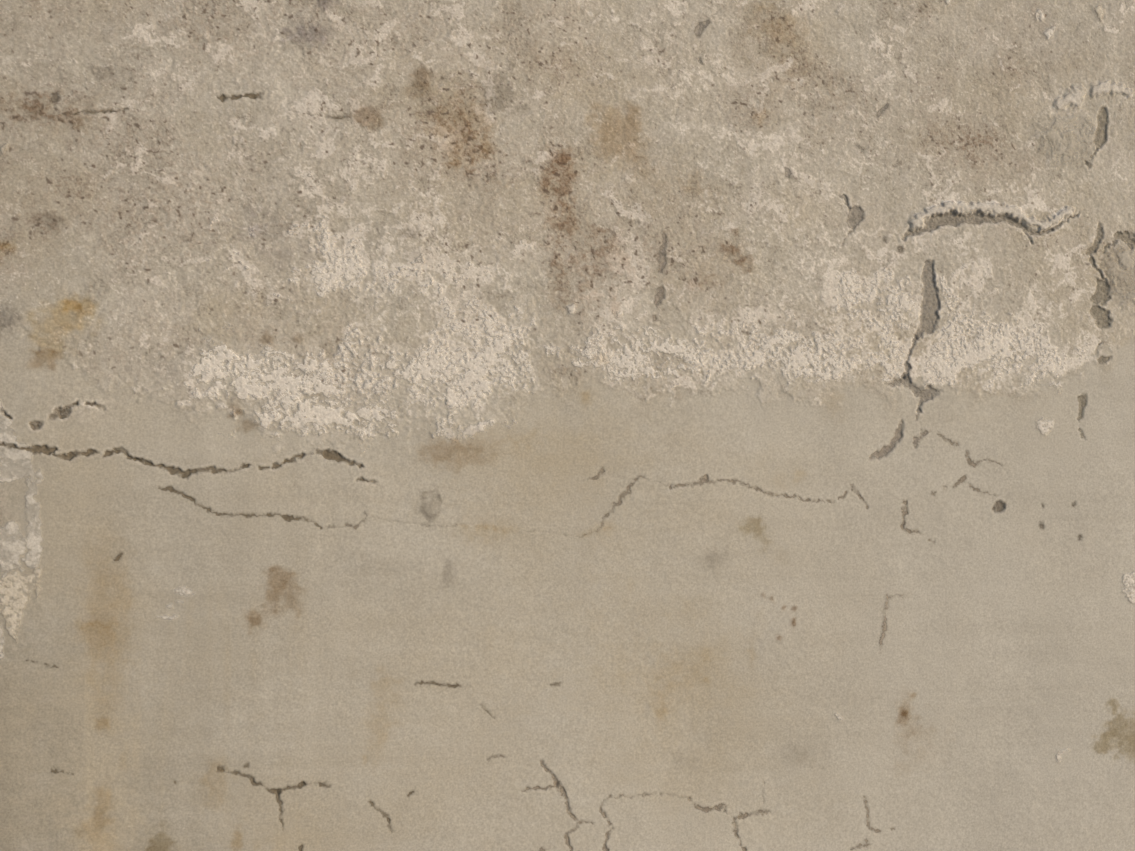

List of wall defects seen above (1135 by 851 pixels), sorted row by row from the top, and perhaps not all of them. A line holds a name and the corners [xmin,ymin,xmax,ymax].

spalling [884,211,1077,252]
peeling [545,225,1135,412]
spalling [30,402,99,430]
spalling [869,421,928,459]
spalling [1077,395,1086,438]
crack [0,442,368,529]
crack [601,478,638,526]
crack [669,475,868,509]
peeling [0,401,43,659]
crack [217,764,329,825]
crack [525,761,647,851]
crack [695,803,765,851]